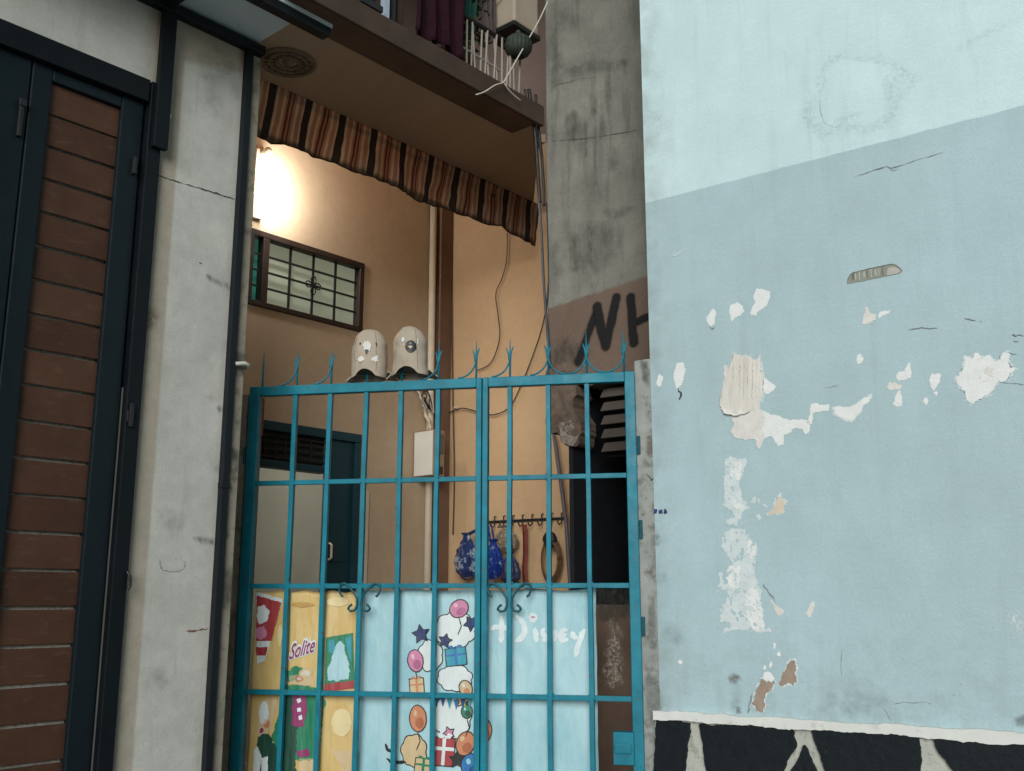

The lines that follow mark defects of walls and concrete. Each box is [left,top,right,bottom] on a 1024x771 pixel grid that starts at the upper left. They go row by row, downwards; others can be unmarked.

crack [159,175,233,199]
peeling [706,309,716,329]
peeling [729,288,770,321]
peeling [862,307,890,325]
peeling [717,349,872,449]
peeling [887,363,912,407]
peeling [923,373,941,405]
peeling [954,350,1018,406]
peeling [717,456,798,713]